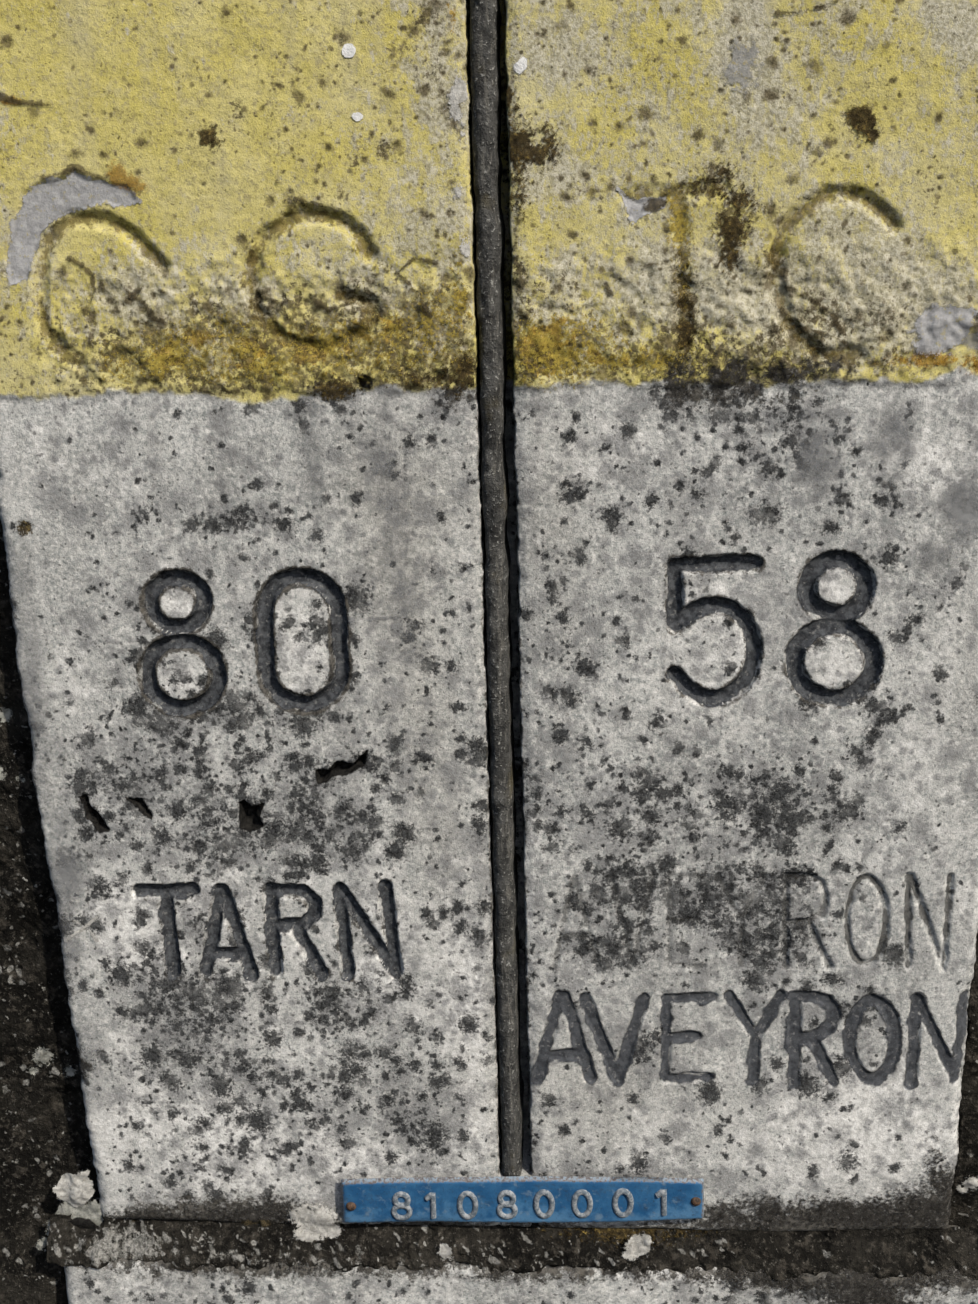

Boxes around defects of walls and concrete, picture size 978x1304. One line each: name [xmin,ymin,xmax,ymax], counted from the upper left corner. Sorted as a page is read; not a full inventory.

peeling [6,163,146,285]
peeling [906,302,978,359]
leakage [669,1131,956,1231]